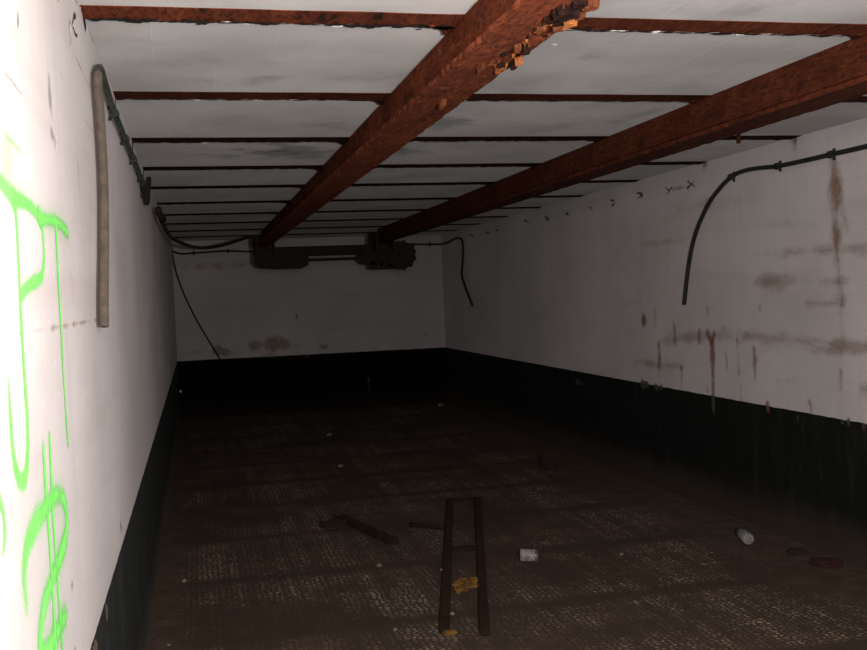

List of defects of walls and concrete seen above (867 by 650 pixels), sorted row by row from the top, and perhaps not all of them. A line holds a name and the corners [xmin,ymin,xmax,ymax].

rust [476,0,600,74]
rust [831,172,840,208]
rust [707,331,715,412]